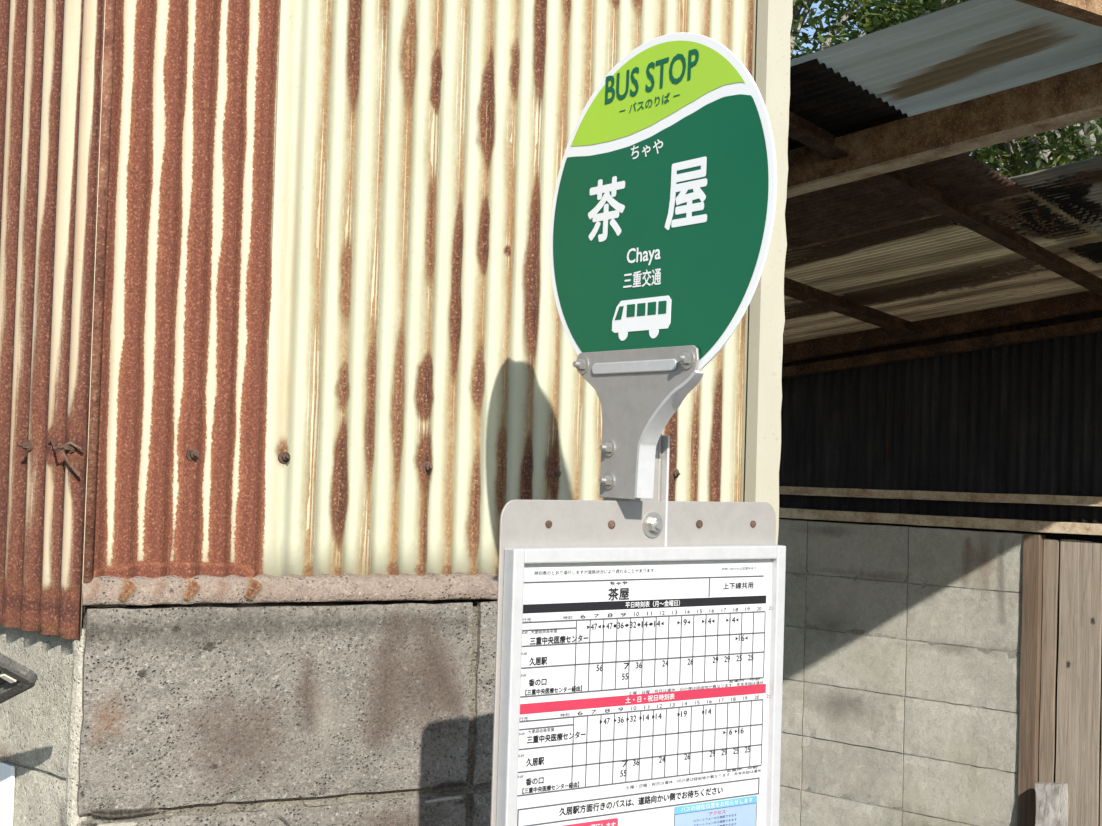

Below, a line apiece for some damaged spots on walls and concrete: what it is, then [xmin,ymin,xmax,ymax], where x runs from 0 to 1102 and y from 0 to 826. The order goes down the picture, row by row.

corrosion [0,0,288,641]
corrosion [304,0,332,577]
corrosion [331,0,362,576]
corrosion [359,0,389,576]
corrosion [388,0,443,576]
corrosion [443,0,469,574]
corrosion [467,0,495,575]
corrosion [496,0,547,574]
corrosion [546,306,560,500]
corrosion [557,0,571,177]
corrosion [665,410,677,501]
corrosion [691,349,723,502]